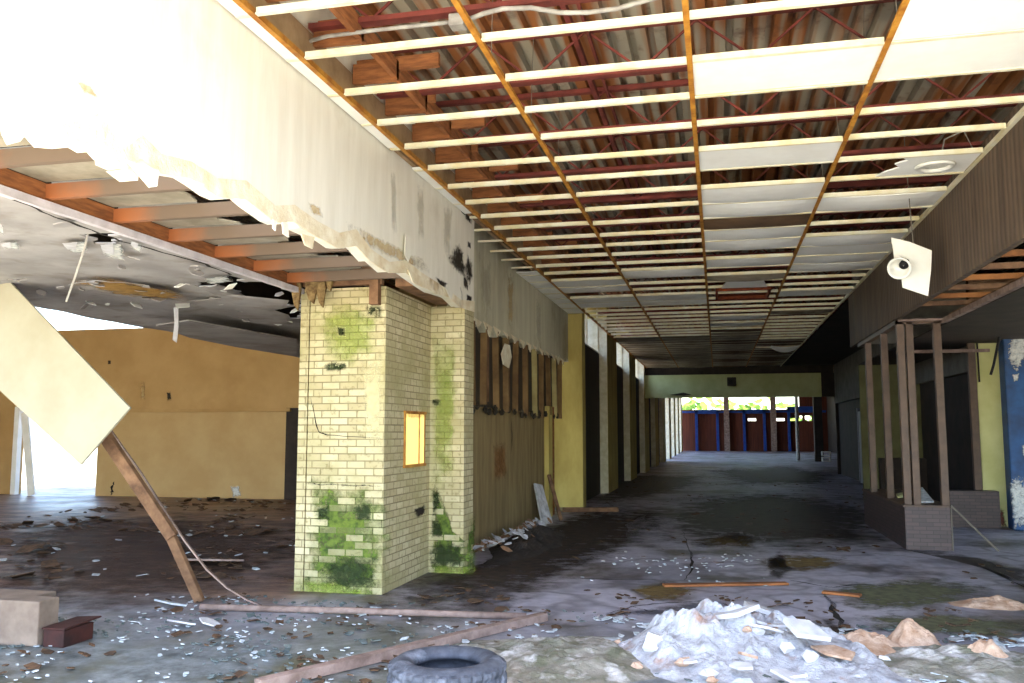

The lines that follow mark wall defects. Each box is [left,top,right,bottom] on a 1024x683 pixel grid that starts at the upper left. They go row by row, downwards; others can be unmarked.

flaking render [0,84,564,368]
leakage [449,242,472,290]
peeling [1008,339,1024,381]
peeling [1000,480,1024,527]
crack [610,532,698,613]